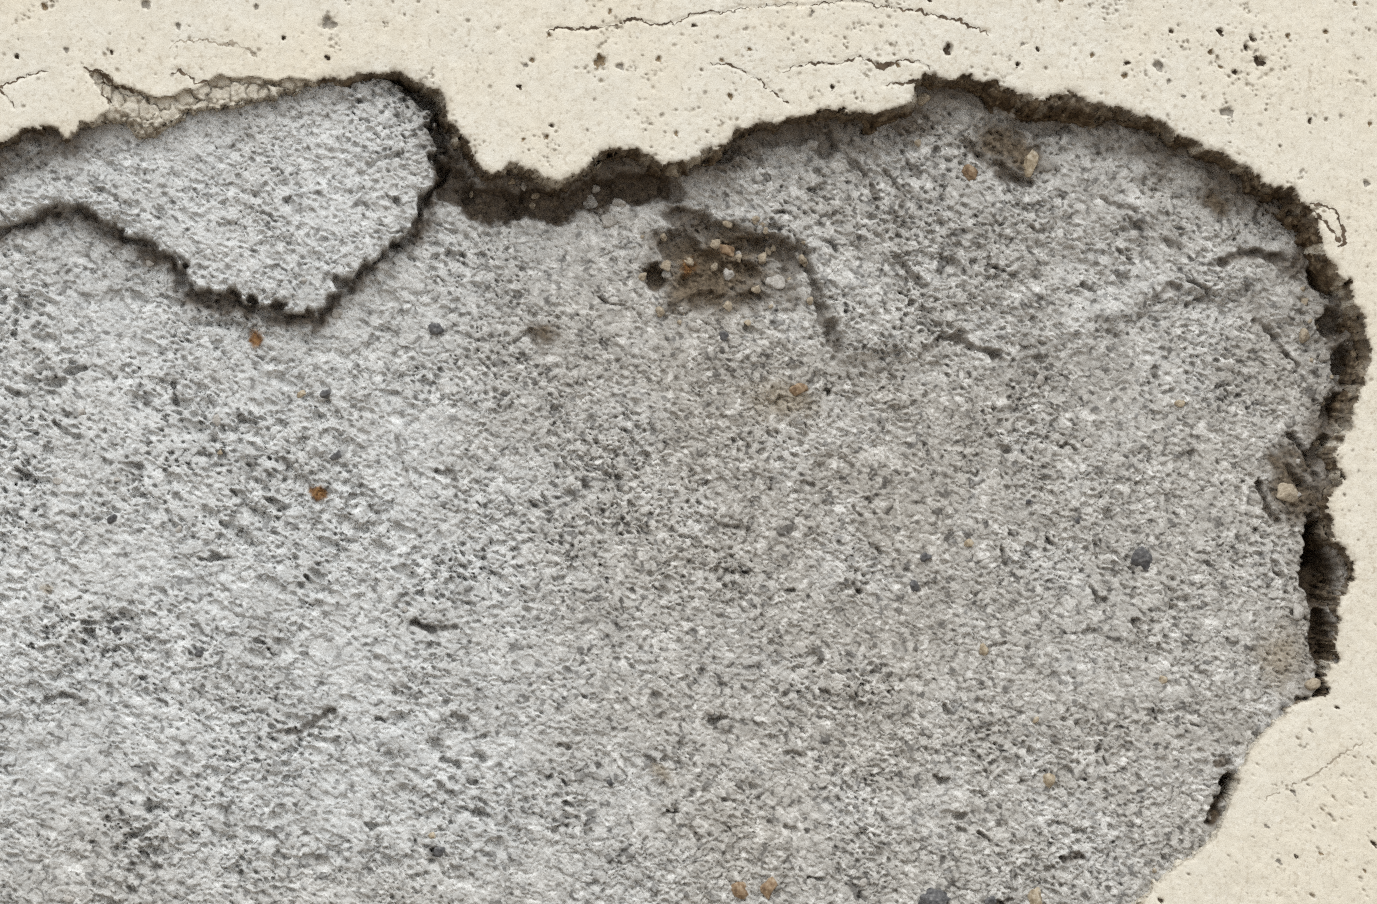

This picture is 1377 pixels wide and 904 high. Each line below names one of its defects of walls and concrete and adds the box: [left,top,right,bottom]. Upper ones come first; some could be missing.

crack [548,0,989,36]
crack [170,38,257,84]
crack [0,70,48,108]
crack [83,66,135,103]
spalling [0,71,1372,618]
spalling [1320,623,1338,636]
spalling [1314,635,1340,681]
spalling [1307,682,1330,701]
spalling [1220,773,1240,803]
spalling [731,881,749,899]
spalling [760,877,778,900]
spalling [918,887,951,904]